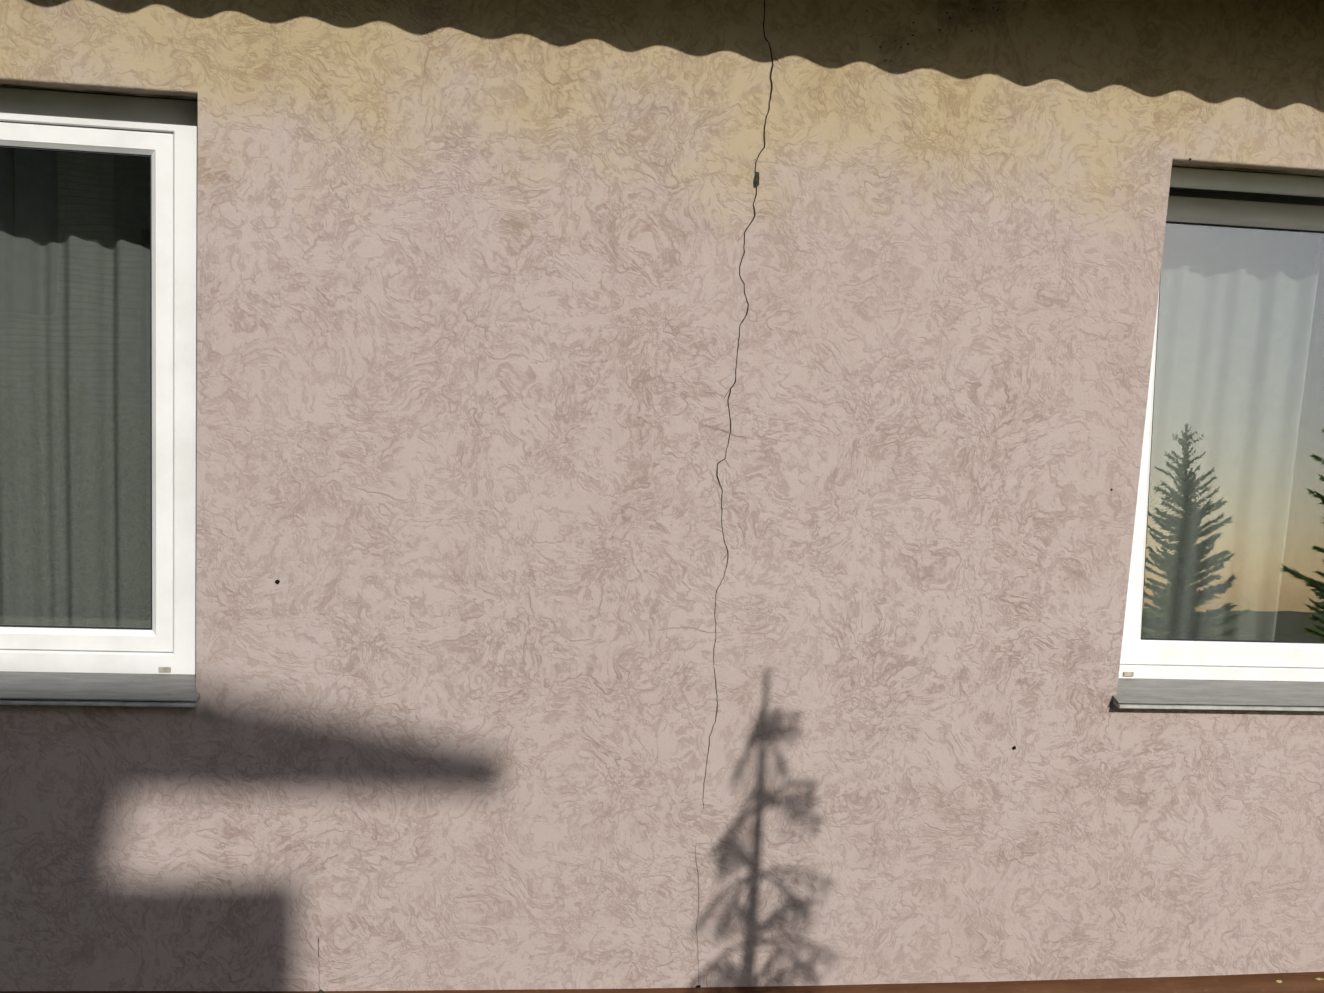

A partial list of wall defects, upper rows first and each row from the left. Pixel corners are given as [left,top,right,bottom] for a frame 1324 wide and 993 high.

crack [661,0,779,805]
crack [694,846,702,988]